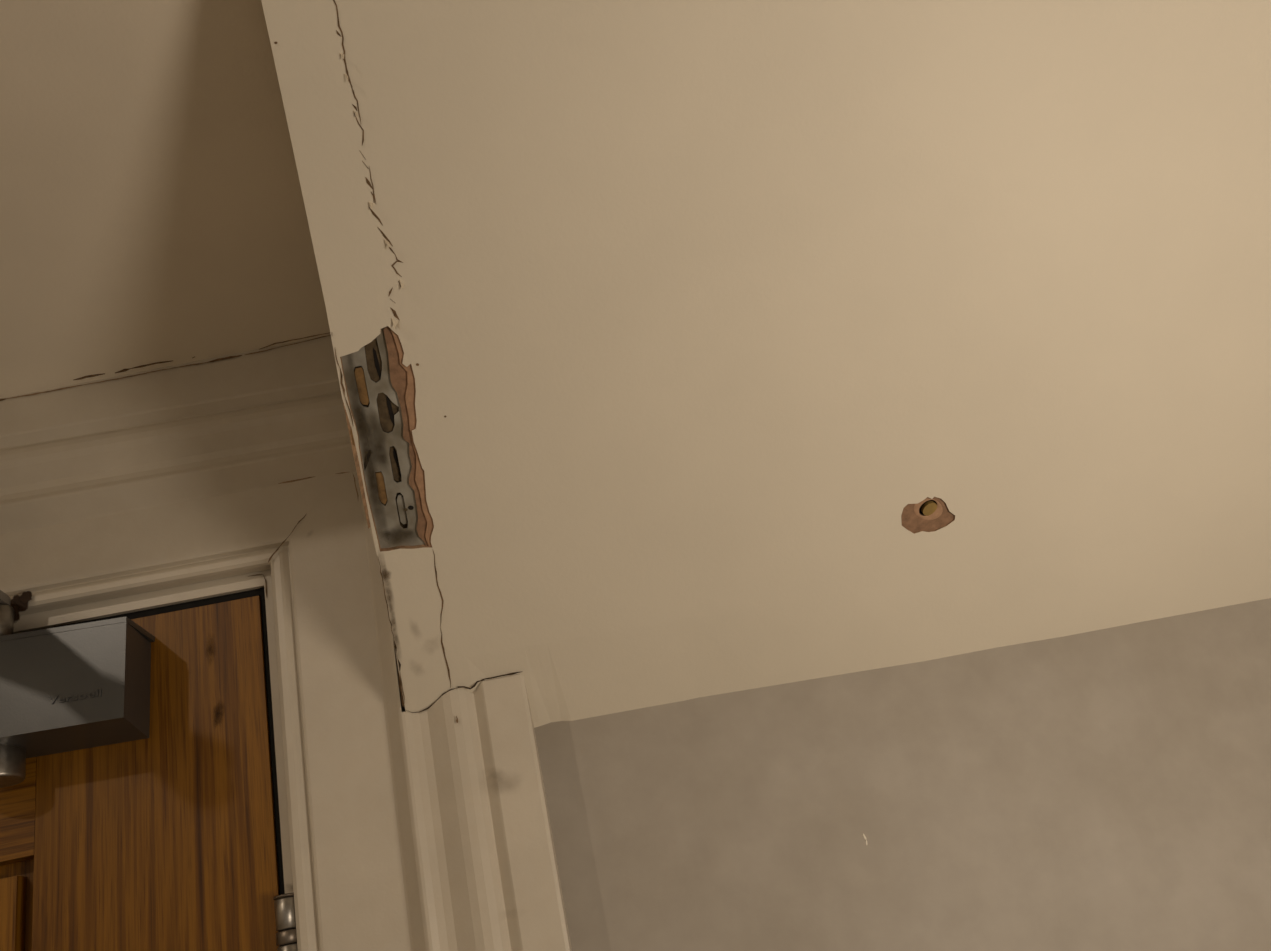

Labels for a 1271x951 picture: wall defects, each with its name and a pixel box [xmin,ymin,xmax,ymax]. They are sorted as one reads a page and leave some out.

crack [333,0,405,330]
crack [0,333,330,401]
crack [251,515,306,597]
spalling [340,326,434,552]
crack [378,551,523,713]
spalling [901,497,955,534]